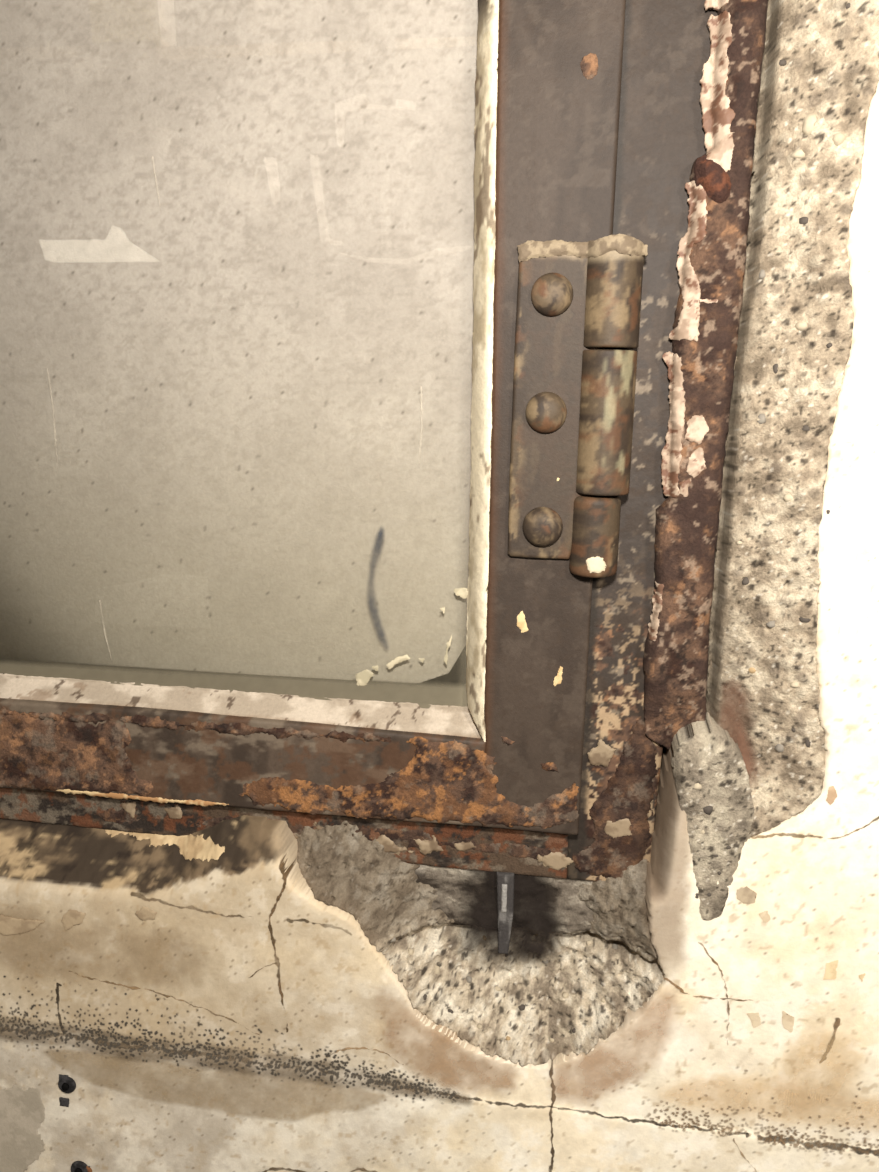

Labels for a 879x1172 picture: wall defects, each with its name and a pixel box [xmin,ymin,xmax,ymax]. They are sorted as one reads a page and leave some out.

peeling [661,181,718,498]
spalling [670,0,879,923]
corrosion [94,808,141,824]
corrosion [0,707,391,796]
corrosion [239,720,657,879]
crack [0,856,325,1059]
spalling [293,818,663,1067]
crack [662,943,747,1030]
damp [0,991,512,1115]
crack [426,1060,879,1172]
damp [650,1098,744,1136]
damp [760,1096,879,1155]